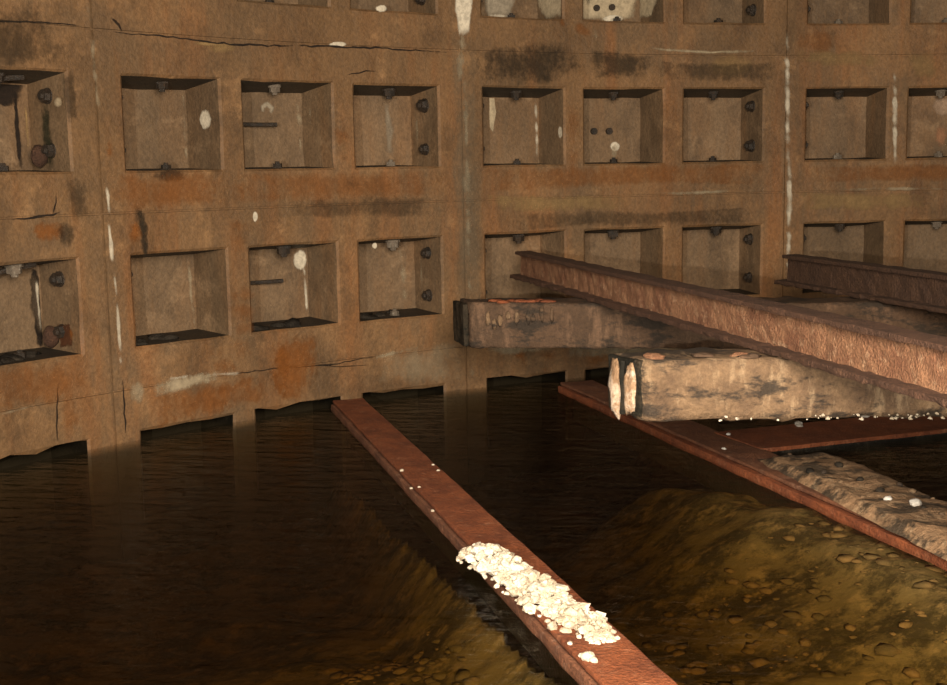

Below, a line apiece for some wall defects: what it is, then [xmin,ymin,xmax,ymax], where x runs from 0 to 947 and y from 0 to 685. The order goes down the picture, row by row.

crack [0,19,76,27]
crack [113,19,433,75]
damp [455,0,472,75]
damp [490,47,562,81]
damp [139,213,148,254]
crack [53,387,61,438]
crack [120,386,128,432]